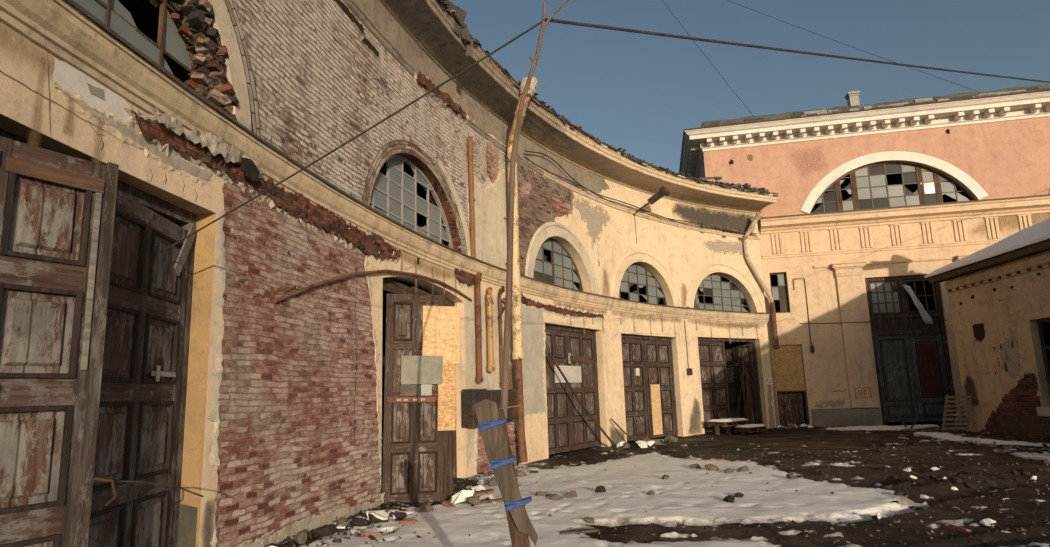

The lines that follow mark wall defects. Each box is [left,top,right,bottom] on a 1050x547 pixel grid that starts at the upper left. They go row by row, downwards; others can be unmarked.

crack [0,51,128,151]
spalling [150,0,239,121]
flaking render [232,0,609,277]
flaking render [53,58,402,547]
peeling [453,266,604,466]
flaking render [972,322,1050,439]